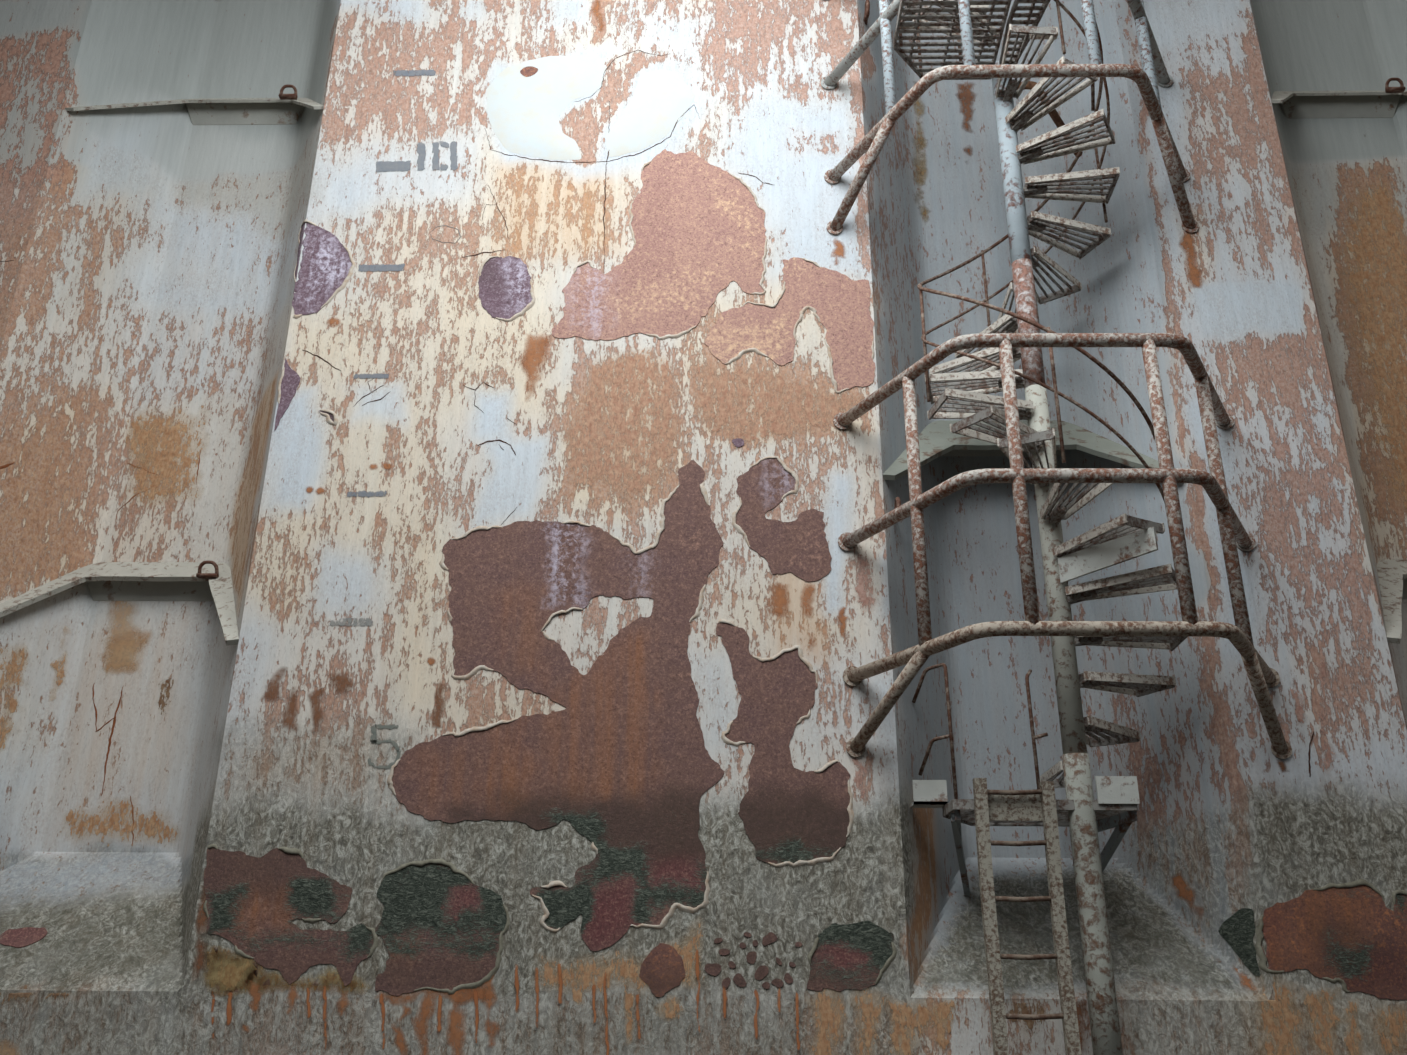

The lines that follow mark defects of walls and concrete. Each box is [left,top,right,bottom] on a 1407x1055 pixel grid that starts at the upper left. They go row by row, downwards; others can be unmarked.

peeling [292,219,356,319]
peeling [478,256,535,322]
peeling [552,149,875,394]
peeling [387,456,832,997]
peeling [716,619,854,868]
corrosion [195,888,499,1055]
peeling [203,844,510,996]
corrosion [515,923,704,1055]
peeling [704,920,897,991]
corrosion [778,988,955,1055]
peeling [1218,879,1407,1000]